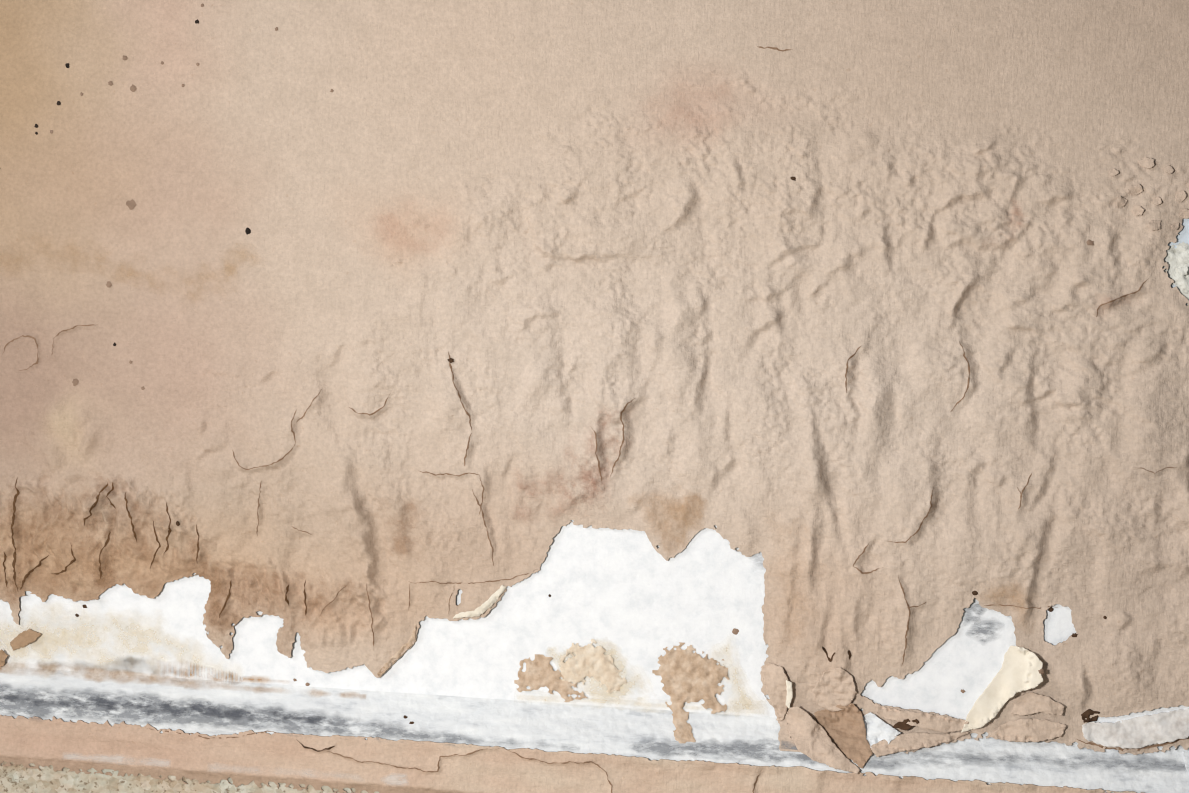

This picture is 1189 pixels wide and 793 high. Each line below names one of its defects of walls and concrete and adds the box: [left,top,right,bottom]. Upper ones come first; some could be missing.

peeling [1116,182,1189,306]
damp [59,698,129,710]
damp [147,704,252,720]
peeling [0,520,1189,787]